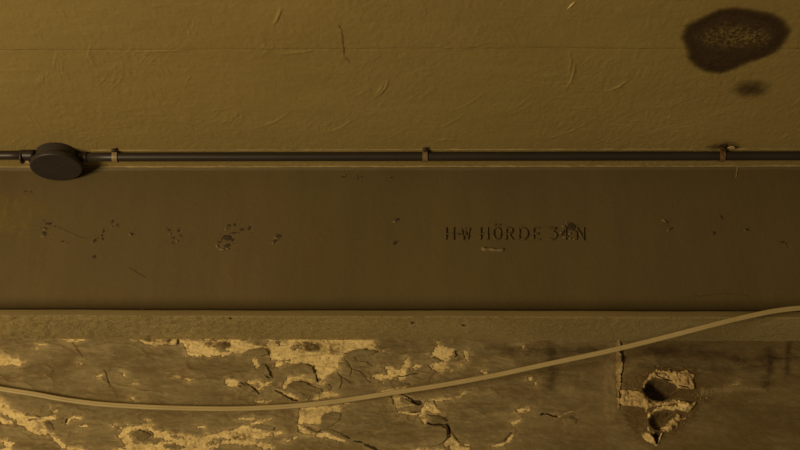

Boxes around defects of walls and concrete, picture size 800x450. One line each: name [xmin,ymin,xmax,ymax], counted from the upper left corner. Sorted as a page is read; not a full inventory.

leakage [684,9,788,72]
peeling [0,354,26,367]
peeling [0,398,87,450]
peeling [111,339,383,450]
crack [338,358,372,387]
peeling [371,340,470,450]
crack [401,394,461,445]
spalling [600,341,766,446]